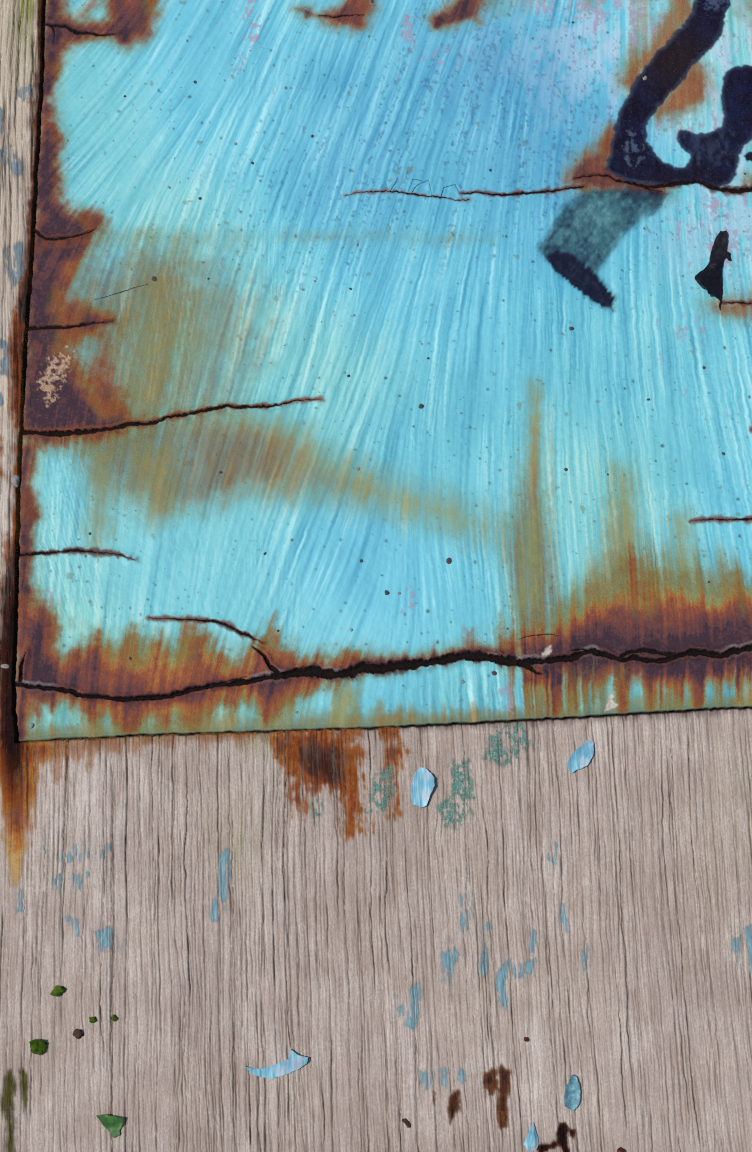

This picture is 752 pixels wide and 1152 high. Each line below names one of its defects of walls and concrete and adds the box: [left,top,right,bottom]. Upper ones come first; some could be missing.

crack [44,22,116,43]
crack [345,172,752,201]
crack [721,298,752,306]
crack [23,396,322,438]
corrosion [0,0,752,884]
crack [689,515,752,523]
crack [19,547,135,561]
crack [15,615,752,704]